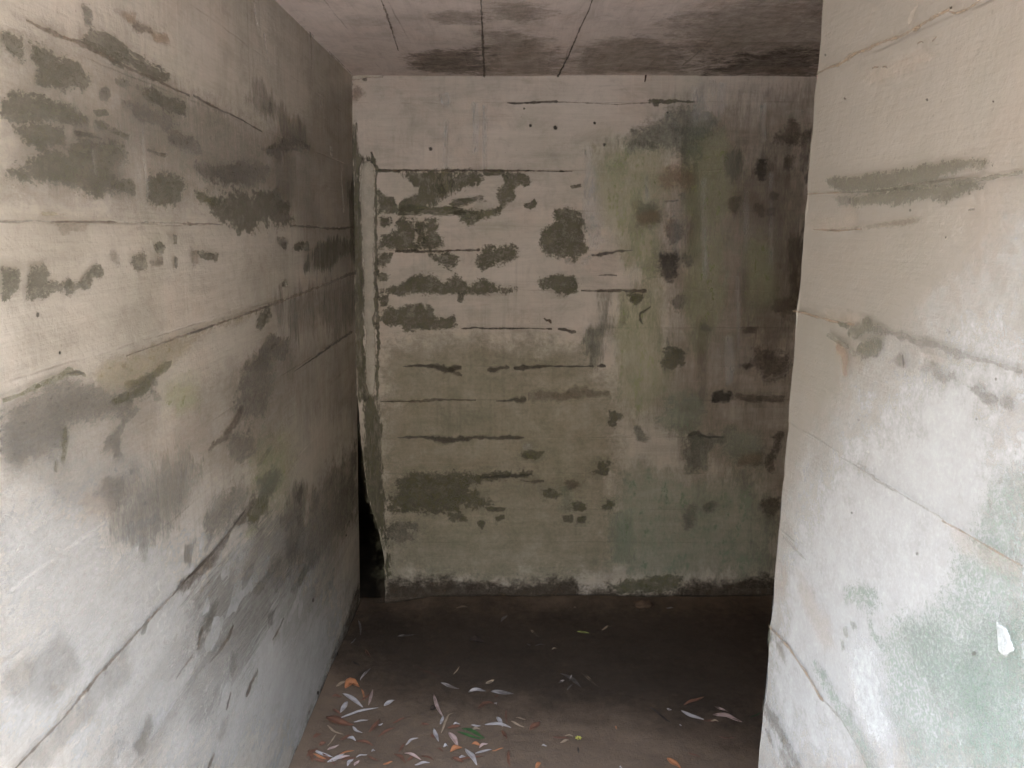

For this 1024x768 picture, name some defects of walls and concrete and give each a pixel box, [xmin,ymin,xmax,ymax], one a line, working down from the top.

leakage [408,47,486,75]
crack [508,0,593,105]
leakage [703,48,819,77]
crack [816,0,980,74]
leakage [0,4,355,273]
leakage [607,99,742,295]
leakage [826,158,993,209]
crack [844,171,1023,194]
leakage [372,168,531,332]
leakage [775,229,861,313]
leakage [3,315,1024,768]
crack [942,520,1023,567]